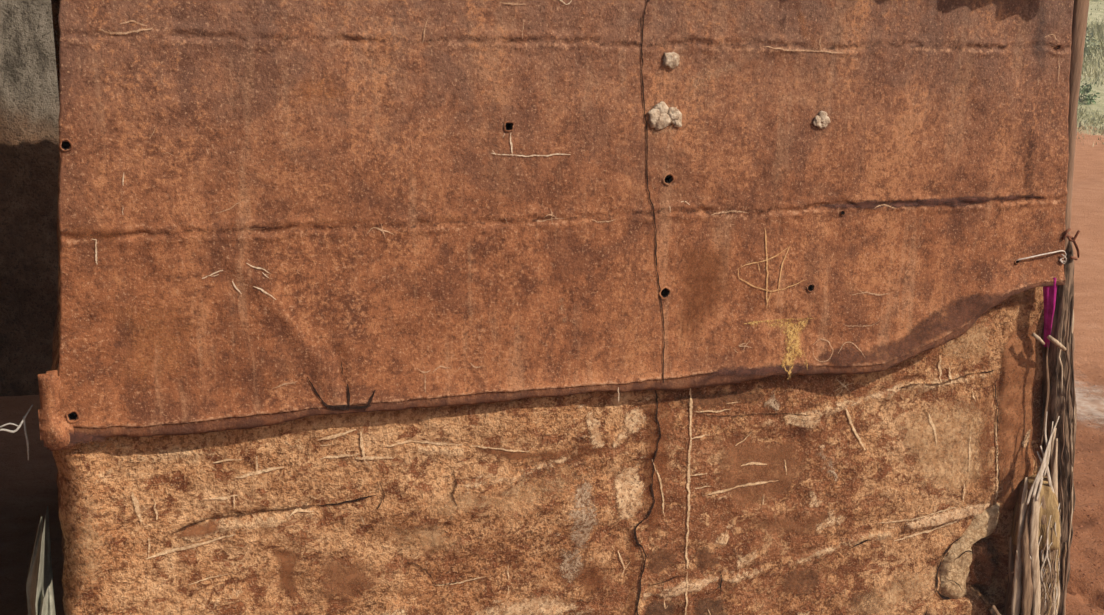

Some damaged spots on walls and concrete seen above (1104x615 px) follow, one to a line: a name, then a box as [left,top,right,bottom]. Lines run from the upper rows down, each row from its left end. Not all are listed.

corrosion [805,131,1041,210]
crack [634,0,684,615]
corrosion [709,292,1031,387]
spalling [440,447,571,515]
flaking render [555,457,645,583]
spalling [273,550,298,597]
flaking render [476,596,584,615]
flaking render [642,525,758,615]